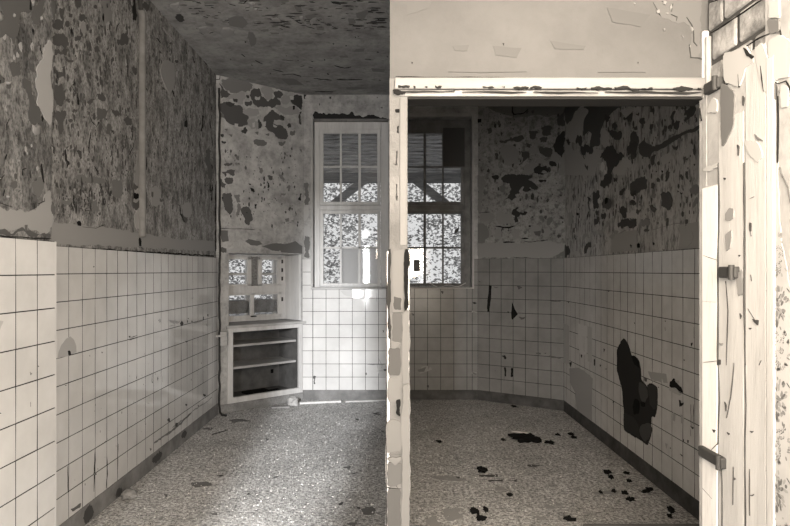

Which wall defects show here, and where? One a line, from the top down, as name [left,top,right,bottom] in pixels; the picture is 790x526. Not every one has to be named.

peeling [239,0,388,38]
crack [653,0,762,60]
peeling [478,223,509,244]
peeling [387,249,402,340]